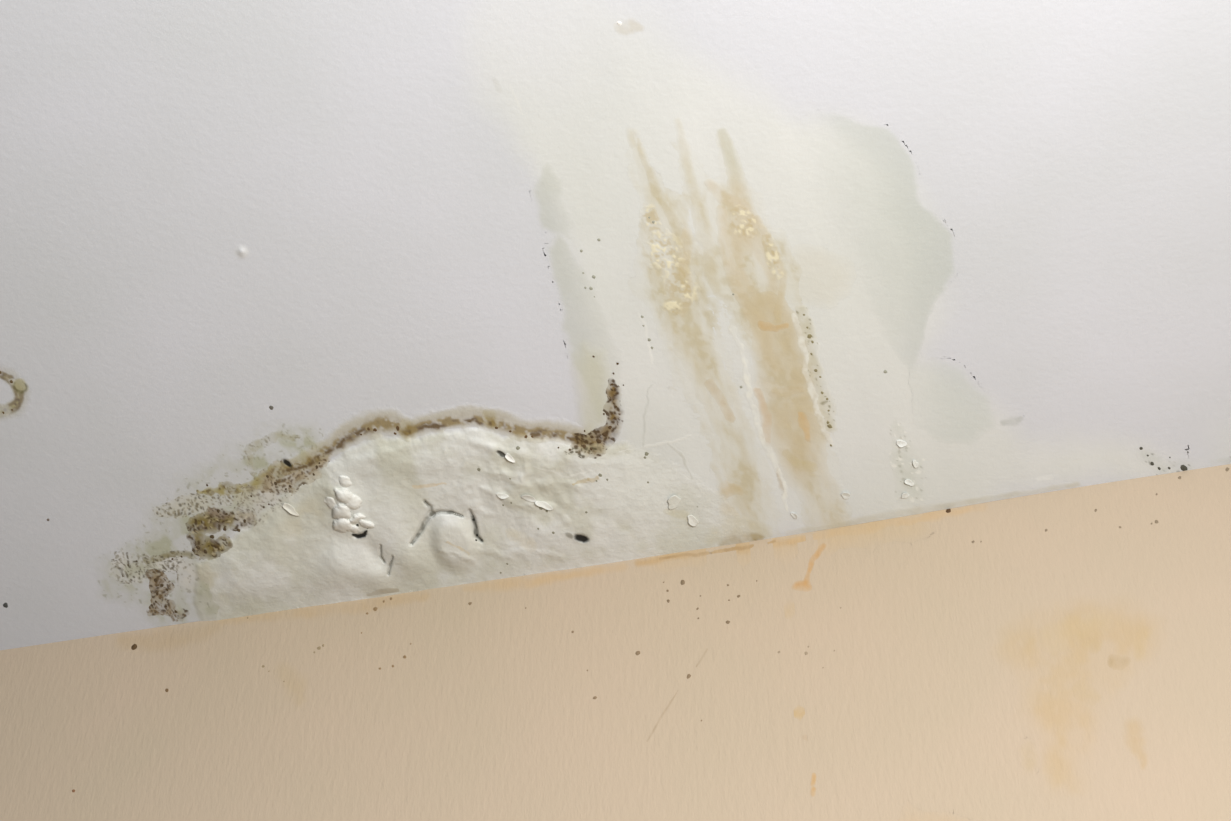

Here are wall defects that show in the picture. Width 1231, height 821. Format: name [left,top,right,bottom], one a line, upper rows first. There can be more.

damp [0,362,33,423]
corrosion [110,589,434,658]
damp [91,0,1231,628]
corrosion [460,117,989,621]